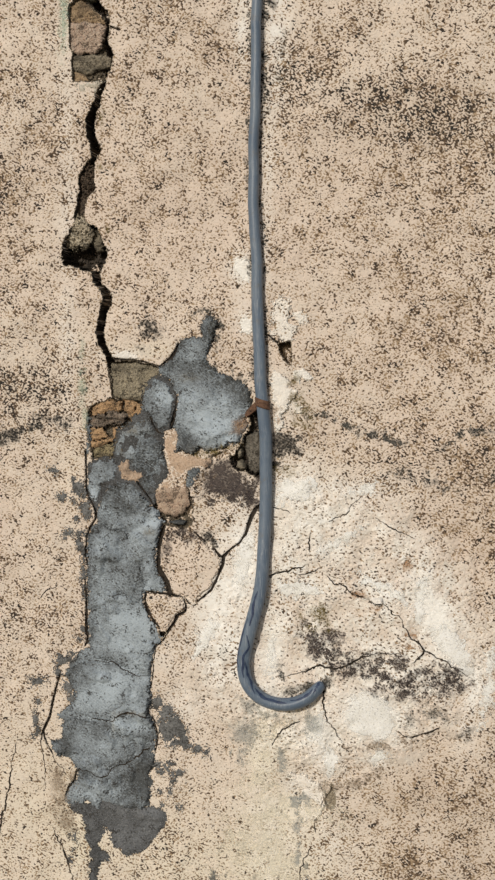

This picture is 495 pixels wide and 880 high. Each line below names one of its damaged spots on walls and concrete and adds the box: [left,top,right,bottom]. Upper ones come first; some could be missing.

crack [73,0,178,396]
spalling [85,350,160,482]
flaking render [147,429,221,639]
crack [84,450,290,689]
water stain [189,459,260,509]
spalling [229,411,260,478]
crack [322,691,342,741]
crack [269,532,470,678]
water stain [277,603,475,728]
crack [399,728,439,739]
water stain [387,466,462,496]
water stain [221,792,316,879]